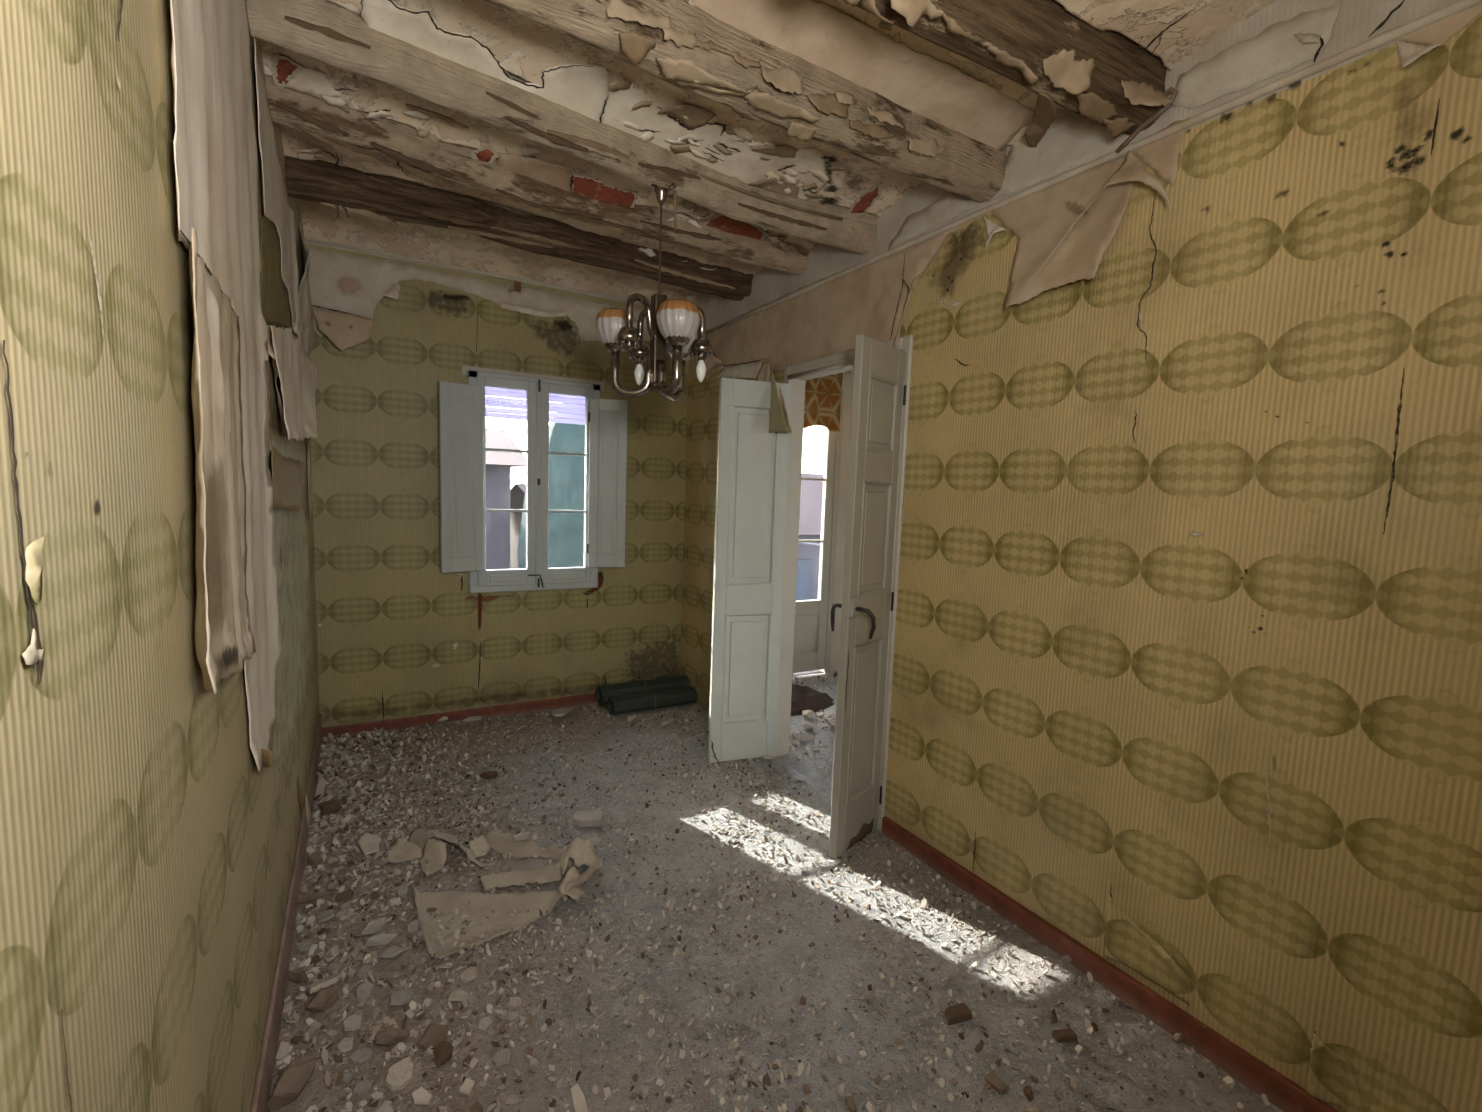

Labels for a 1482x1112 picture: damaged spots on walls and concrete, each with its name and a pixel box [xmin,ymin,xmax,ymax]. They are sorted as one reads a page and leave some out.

crack [116,0,124,41]
peeling [270,54,448,151]
peeling [360,0,1173,208]
damp [1387,130,1433,173]
damp [1451,128,1471,143]
flaking render [666,194,813,248]
flaking render [847,182,884,216]
damp [933,230,979,307]
crack [1137,195,1157,360]
crack [2,340,45,685]